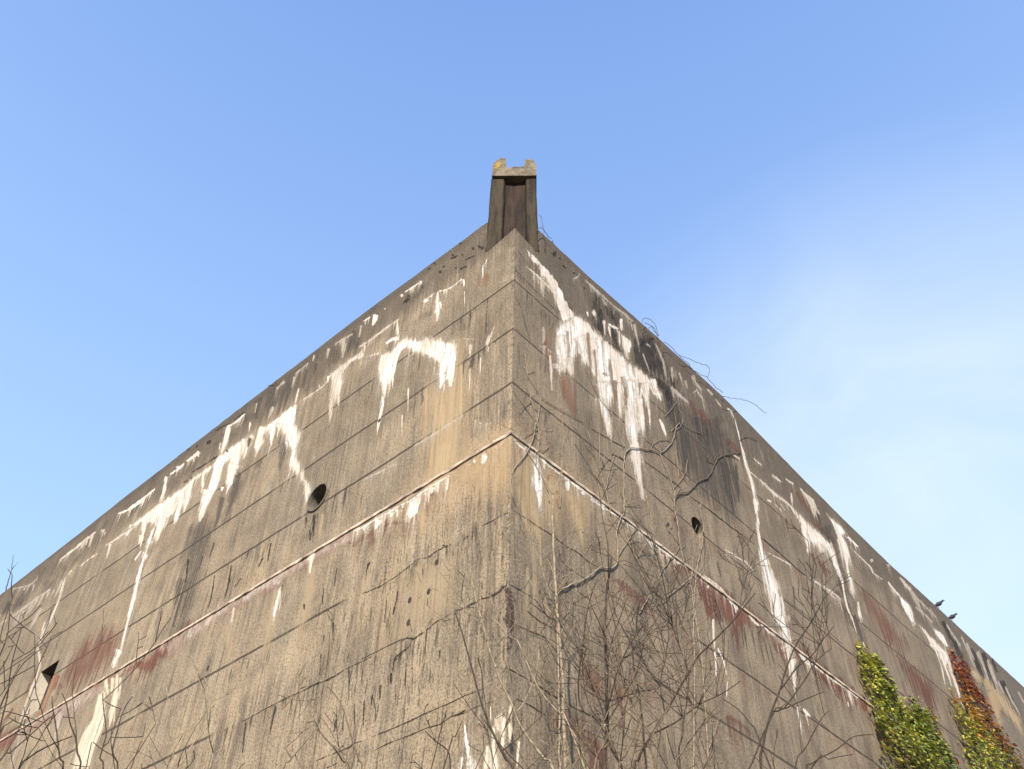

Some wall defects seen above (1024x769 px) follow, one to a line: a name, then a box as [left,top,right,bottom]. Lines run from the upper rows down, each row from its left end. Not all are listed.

damp [1,251,1024,769]